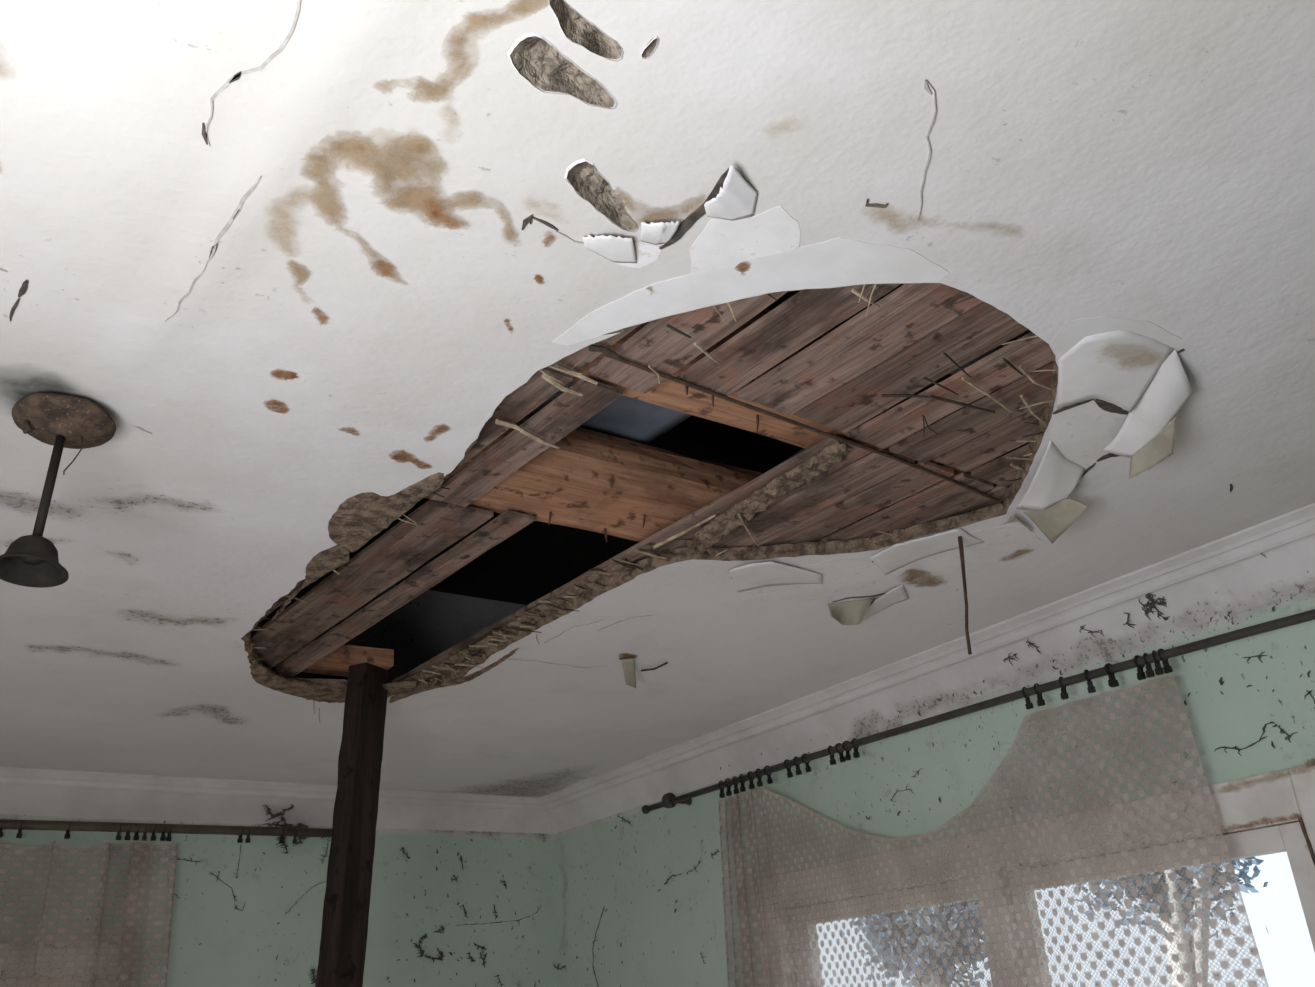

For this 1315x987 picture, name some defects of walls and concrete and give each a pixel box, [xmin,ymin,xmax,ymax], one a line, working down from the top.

crack [202,0,301,146]
leakage [415,0,548,99]
spalling [507,0,624,109]
spalling [641,36,659,59]
crack [165,177,261,322]
leakage [273,139,482,284]
leakage [499,211,515,240]
crack [865,200,888,208]
crack [918,79,937,221]
peeling [407,158,1194,691]
spalling [241,580,348,686]